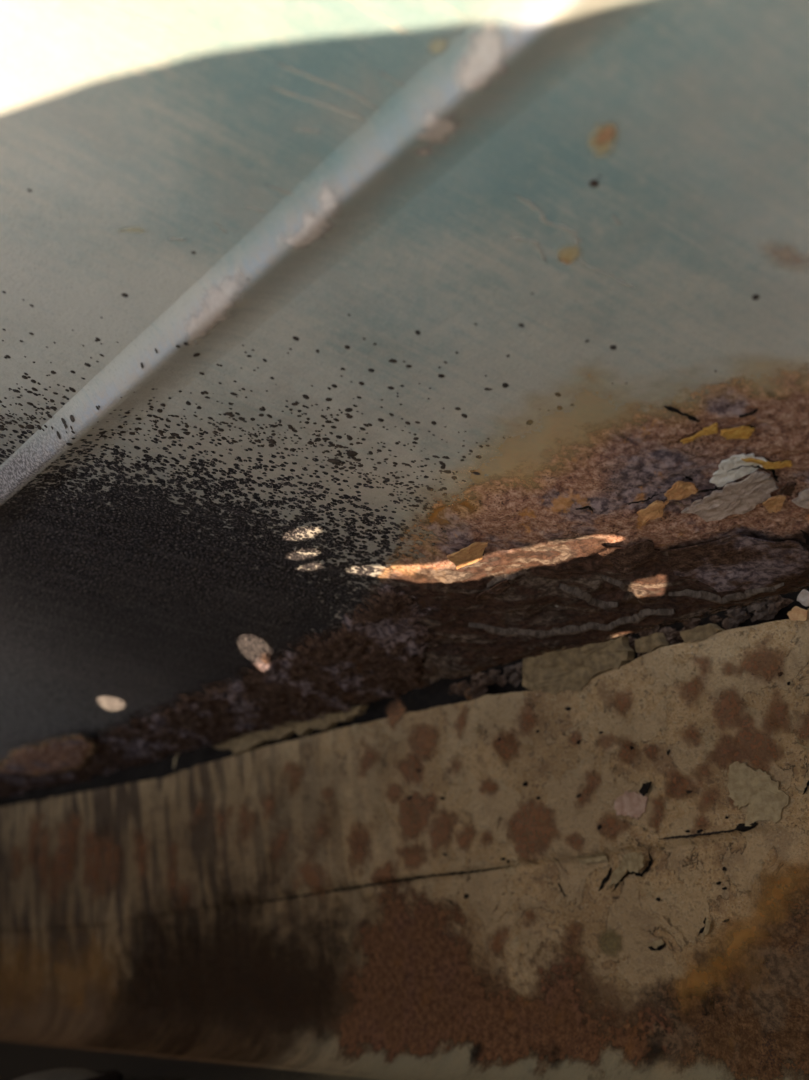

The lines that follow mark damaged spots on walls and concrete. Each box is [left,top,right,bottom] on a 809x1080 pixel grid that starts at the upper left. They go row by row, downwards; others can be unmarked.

peeling [458,27,504,91]
peeling [284,185,338,248]
peeling [187,278,240,344]
corrosion [0,371,809,799]
corrosion [649,690,809,833]
crack [658,822,758,839]
crack [244,864,519,906]